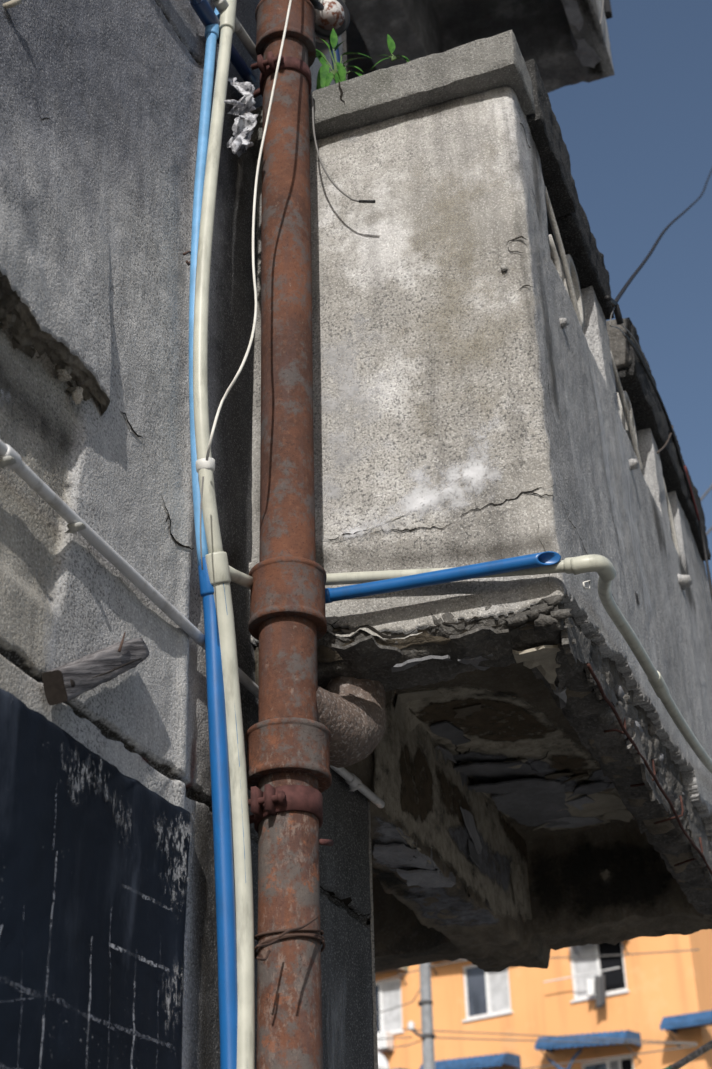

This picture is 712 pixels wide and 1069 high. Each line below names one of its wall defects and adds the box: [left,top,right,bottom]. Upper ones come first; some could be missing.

leakage [580,0,603,44]
spalling [47,355,83,405]
crack [161,493,194,550]
crack [318,485,588,555]
spalling [317,573,712,920]
crack [320,886,371,919]